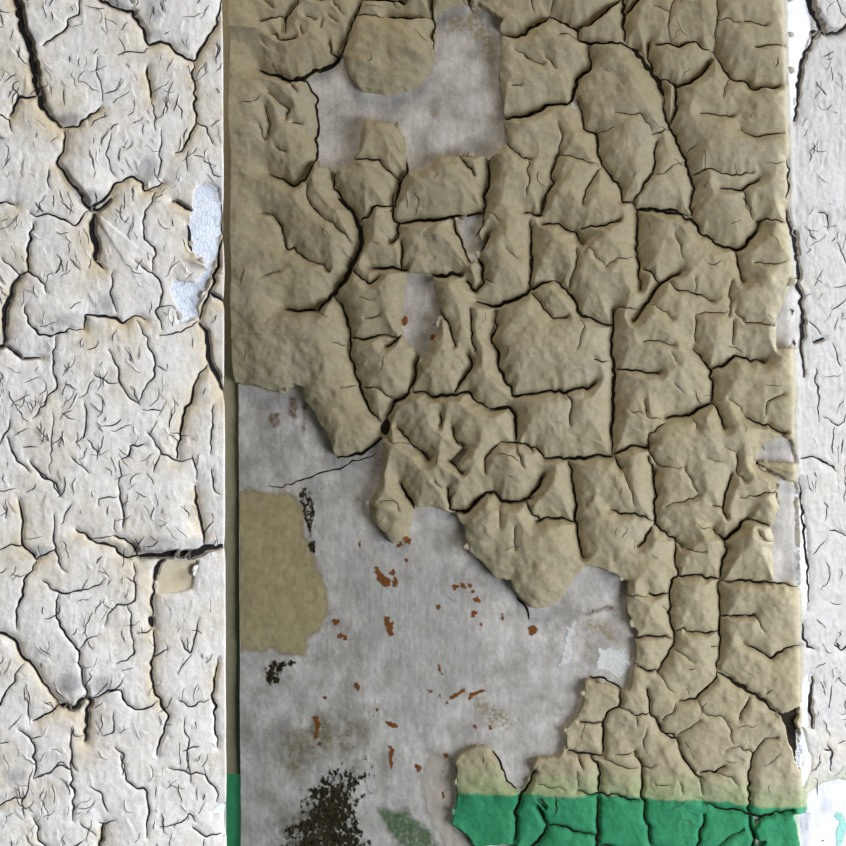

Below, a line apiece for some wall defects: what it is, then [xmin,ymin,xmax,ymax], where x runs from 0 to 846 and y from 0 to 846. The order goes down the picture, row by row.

peeling [308,4,507,172]
crack [242,0,846,846]
corrosion [375,566,398,587]
corrosion [384,616,394,636]
peeling [238,384,637,846]
corrosion [452,583,483,627]
corrosion [427,688,485,704]
corrosion [312,716,323,746]
peeling [775,675,846,846]
peeling [211,802,225,835]
damp [282,758,375,846]